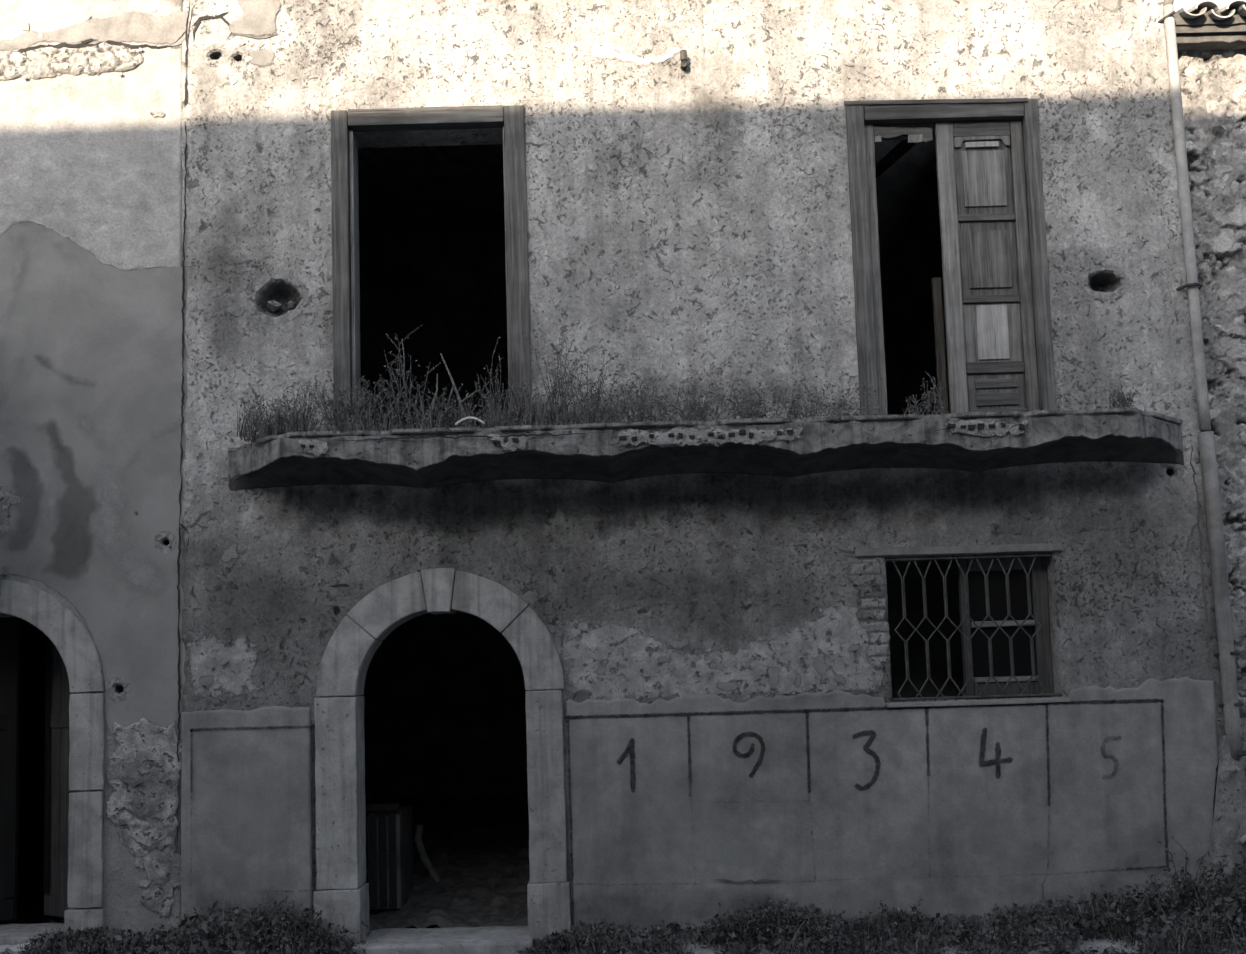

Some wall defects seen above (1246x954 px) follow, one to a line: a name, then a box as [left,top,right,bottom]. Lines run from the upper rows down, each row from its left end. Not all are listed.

flaking render [0,8,188,80]
damp [13,425,163,590]
crack [17,2,278,844]
crack [330,432,614,442]
flaking render [564,558,890,701]
crack [1187,434,1216,693]
spalling [106,718,182,918]